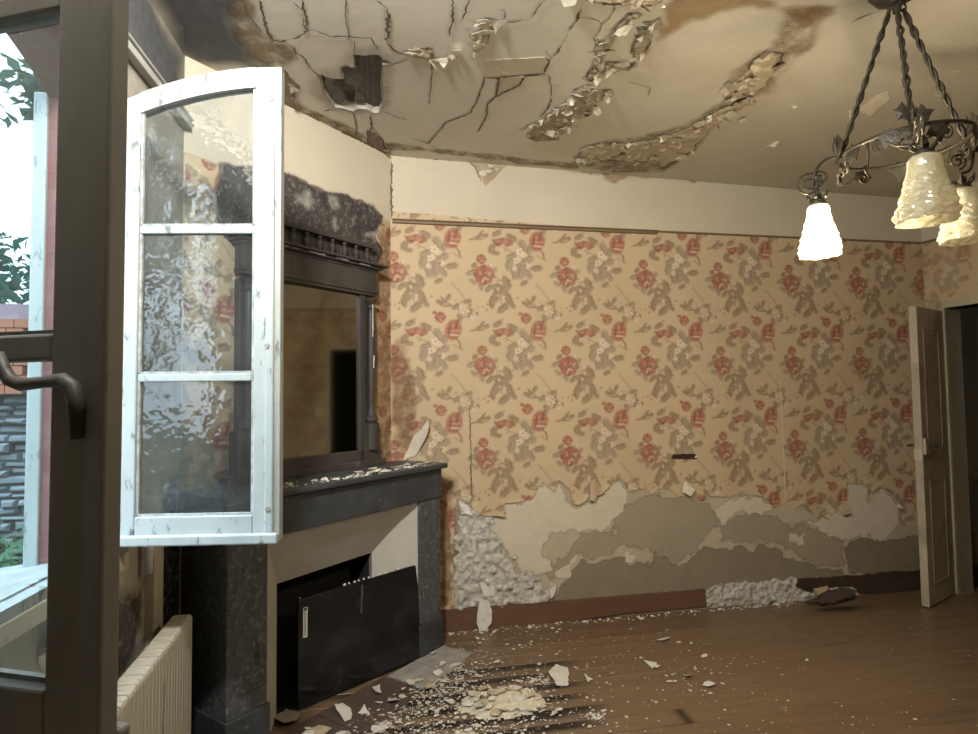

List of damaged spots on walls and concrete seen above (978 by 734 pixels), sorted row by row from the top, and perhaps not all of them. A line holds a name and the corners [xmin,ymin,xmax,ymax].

peeling [283,70,300,106]
crack [243,0,407,79]
peeling [366,129,389,152]
peeling [403,46,456,70]
crack [308,0,652,219]
peeling [470,18,550,97]
peeling [524,0,666,142]
peeling [574,51,785,167]
peeling [788,484,899,545]
peeling [452,481,628,639]
flaking render [706,576,857,607]
leakage [118,596,139,671]